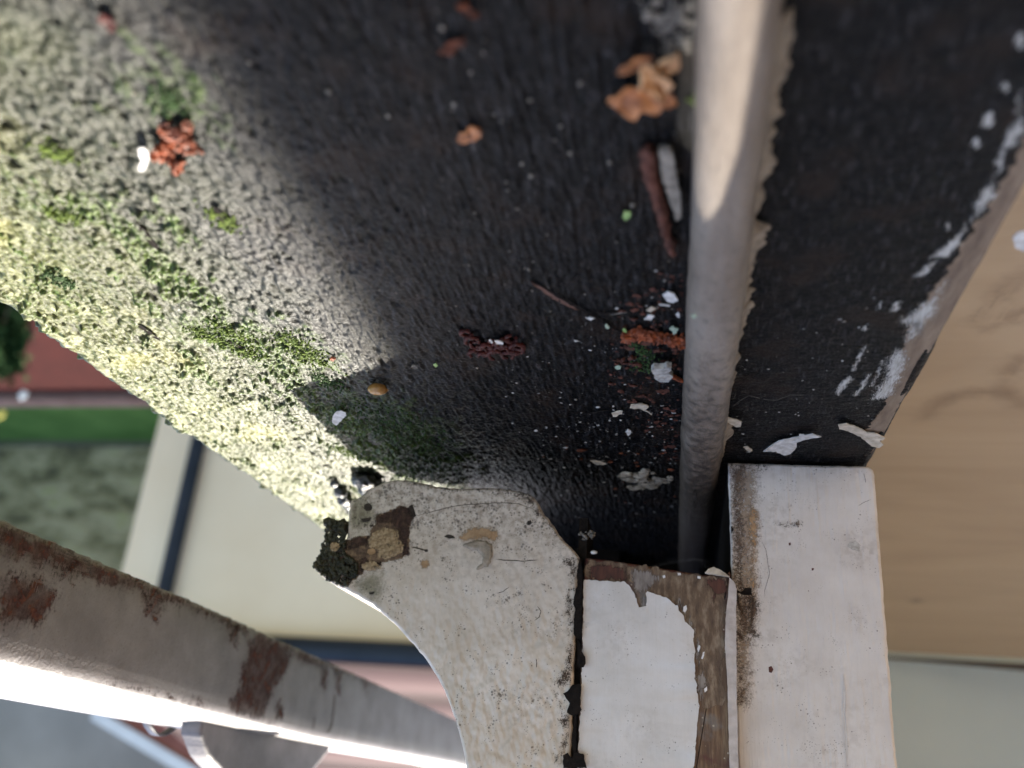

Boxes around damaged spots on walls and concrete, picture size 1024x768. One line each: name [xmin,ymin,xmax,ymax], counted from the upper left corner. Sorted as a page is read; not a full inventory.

peeling [835,82,1024,453]
peeling [743,433,821,456]
corrosion [0,525,377,724]
peeling [316,503,416,587]
peeling [584,550,727,709]
damp [729,464,769,708]